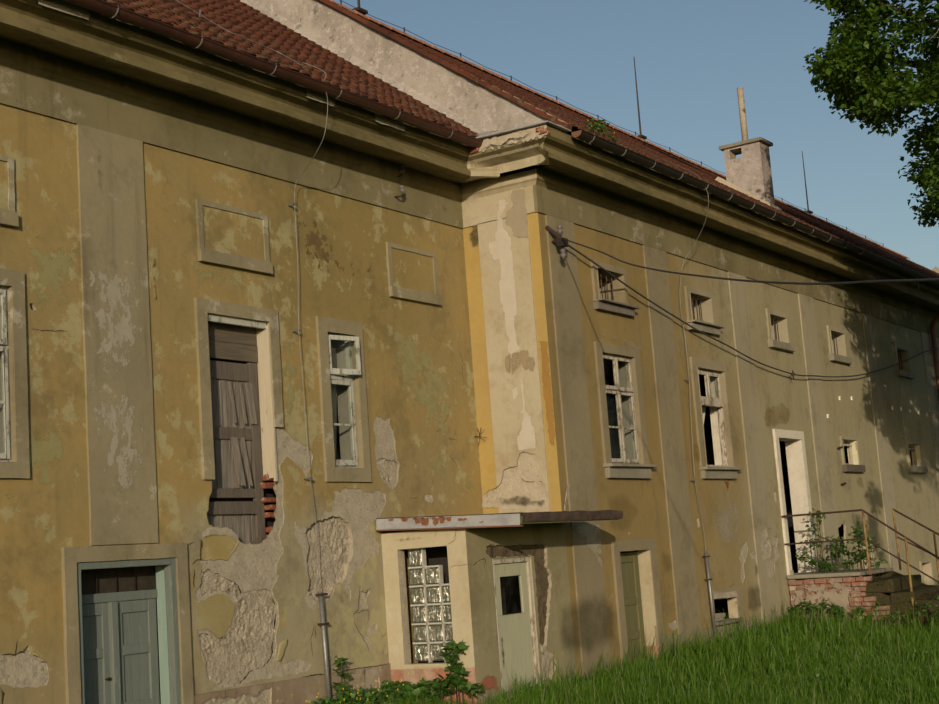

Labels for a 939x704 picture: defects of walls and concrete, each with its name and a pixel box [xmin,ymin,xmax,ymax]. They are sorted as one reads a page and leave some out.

spalling [467,124,550,154]
peeling [89,264,143,375]
spalling [482,189,555,511]
peeling [93,394,144,490]
spalling [195,416,399,704]
spalling [0,647,48,688]